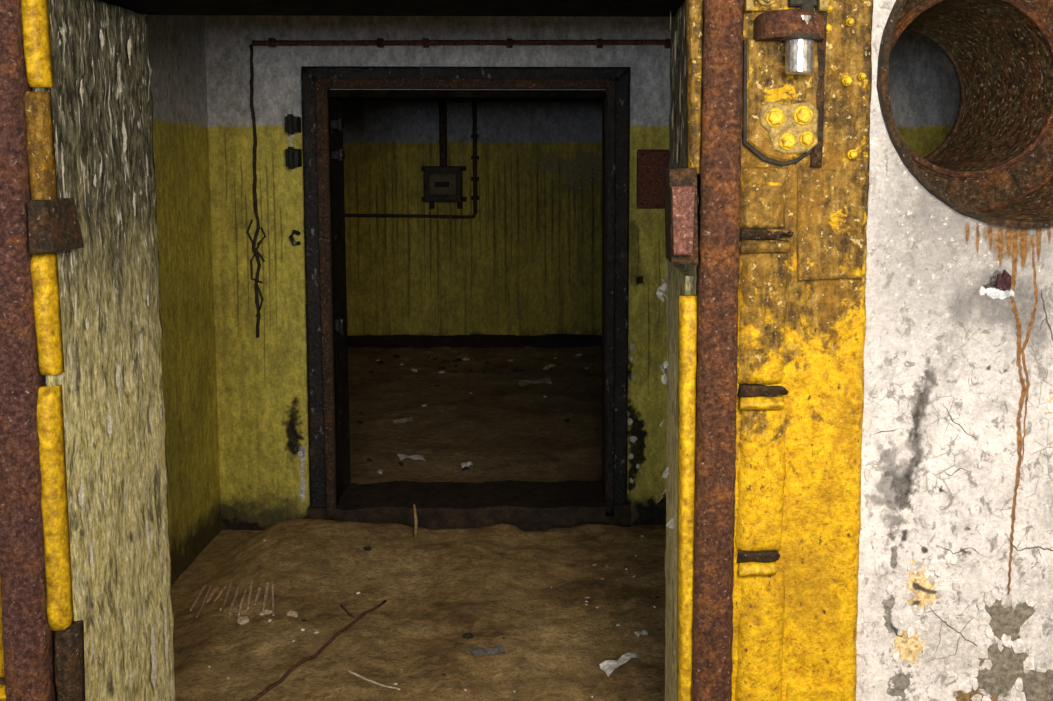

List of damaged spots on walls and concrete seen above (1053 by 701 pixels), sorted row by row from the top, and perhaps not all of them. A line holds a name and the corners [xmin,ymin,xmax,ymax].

leakage [283,398,303,456]
leakage [634,496,666,525]
leakage [875,359,936,573]
corrosion [965,224,1051,595]